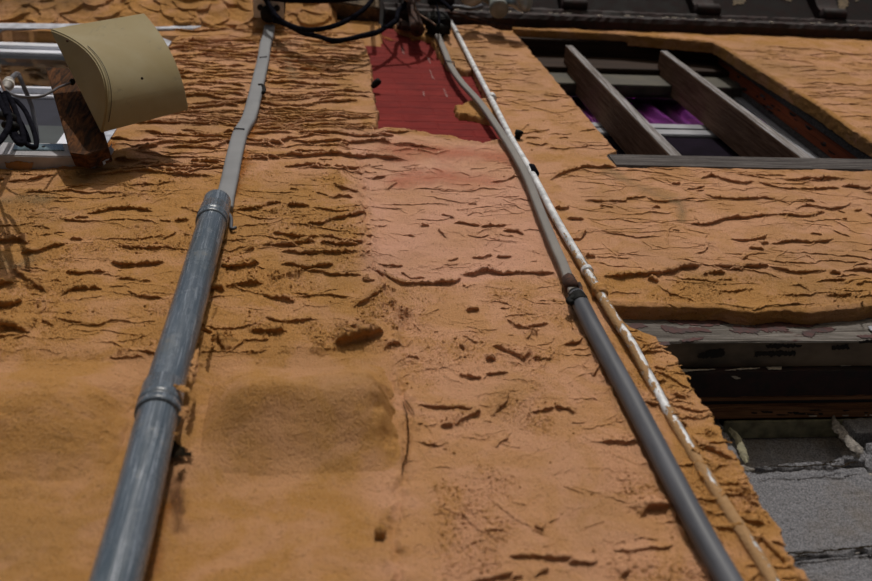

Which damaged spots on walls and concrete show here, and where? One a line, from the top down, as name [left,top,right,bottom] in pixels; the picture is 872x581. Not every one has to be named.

spalling [365,29,500,143]
peeling [659,319,834,379]